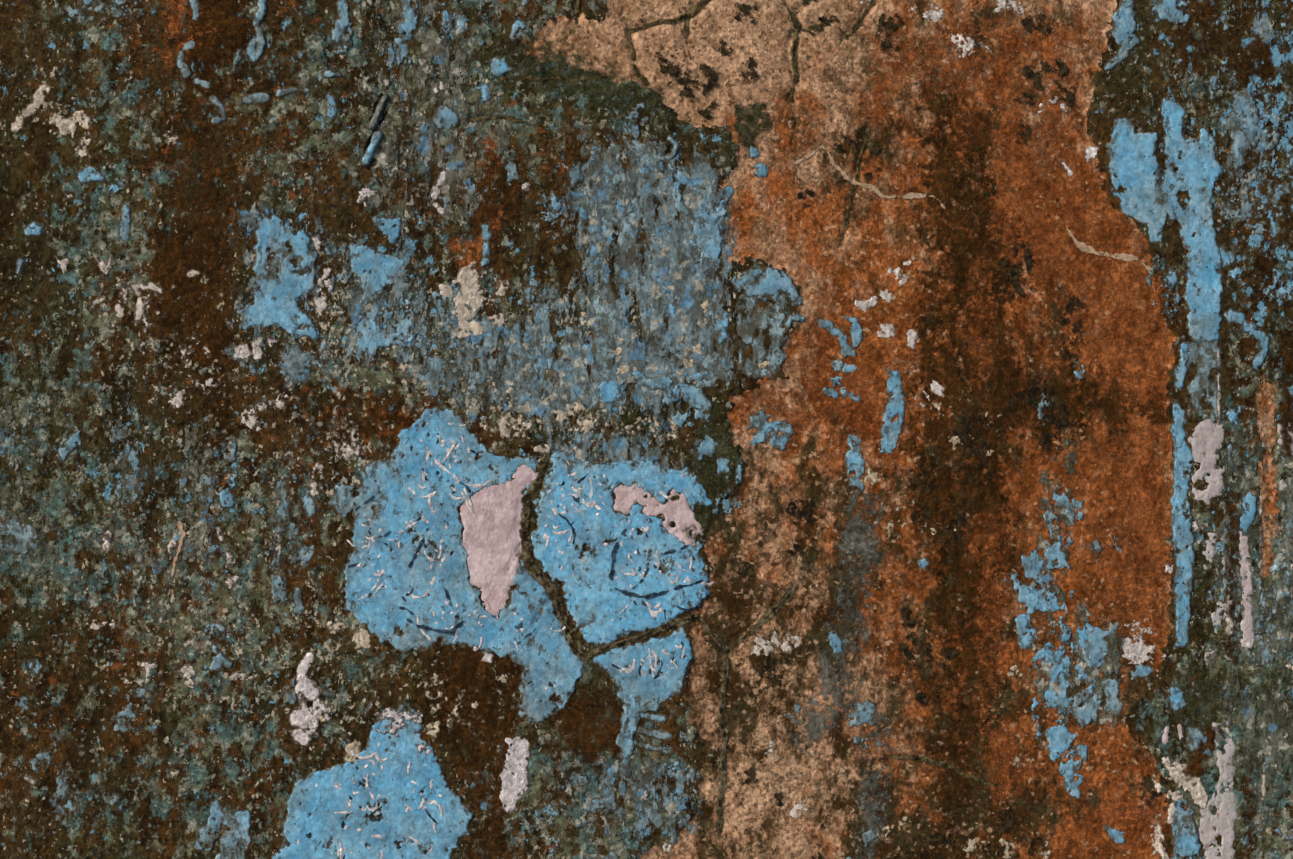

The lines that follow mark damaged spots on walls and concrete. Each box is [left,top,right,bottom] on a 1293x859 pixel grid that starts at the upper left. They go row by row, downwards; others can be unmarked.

corrosion [155,0,216,64]
crack [469,115,527,123]
crack [498,0,710,86]
crack [781,0,945,248]
corrosion [864,17,1167,401]
peeling [165,435,239,563]
flaking render [266,0,1293,859]
corrosion [755,307,887,451]
corrosion [1086,426,1172,640]
crack [513,453,814,838]
corrosion [966,513,1023,806]
peeling [193,799,252,859]